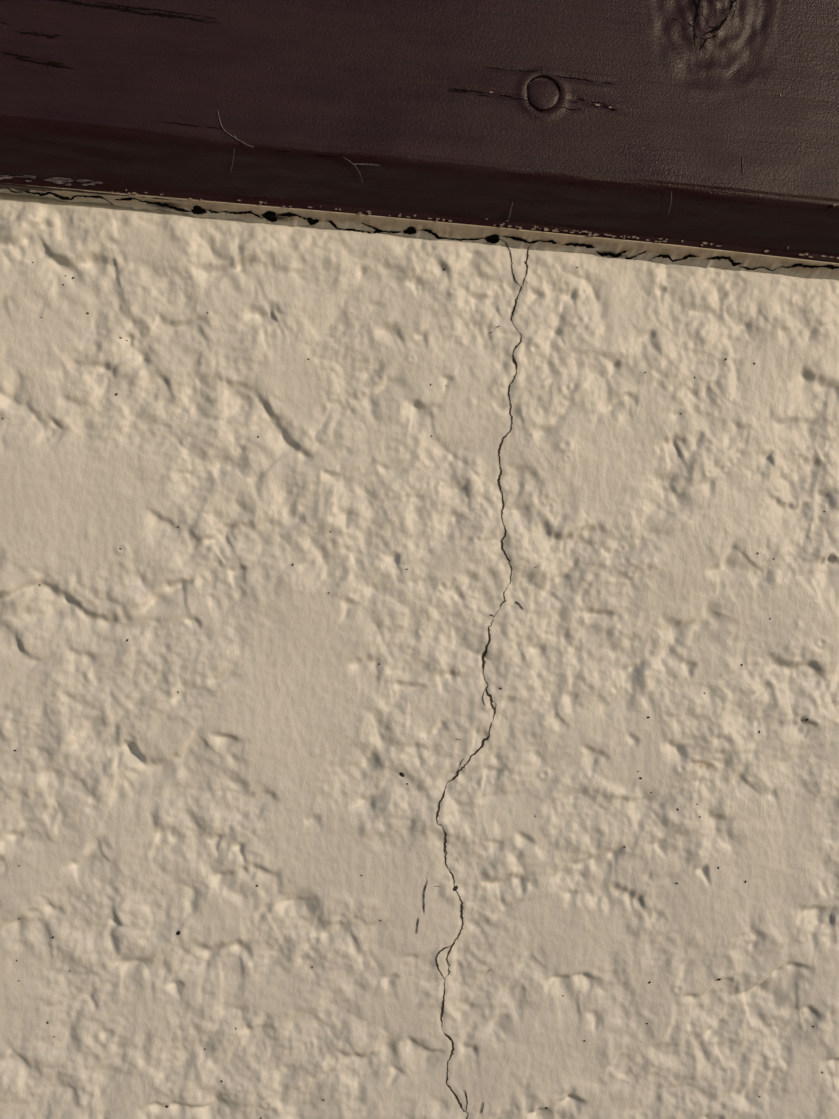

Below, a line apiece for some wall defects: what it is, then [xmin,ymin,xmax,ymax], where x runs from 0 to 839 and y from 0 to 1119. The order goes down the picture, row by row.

crack [0,187,400,234]
crack [416,229,839,1119]